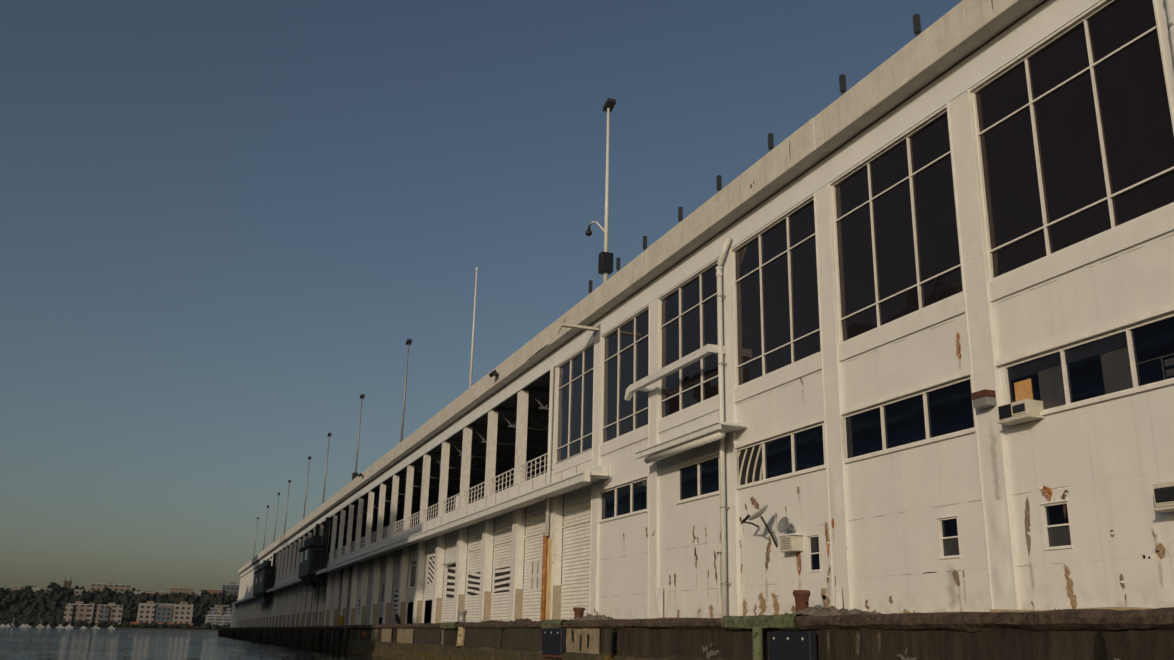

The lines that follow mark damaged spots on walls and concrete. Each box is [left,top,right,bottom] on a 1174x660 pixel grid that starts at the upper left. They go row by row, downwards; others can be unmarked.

peeling [739,496,761,525]
peeling [763,536,772,575]
peeling [740,590,795,616]
peeling [819,566,831,607]
peeling [952,570,965,592]
peeling [1055,563,1078,610]